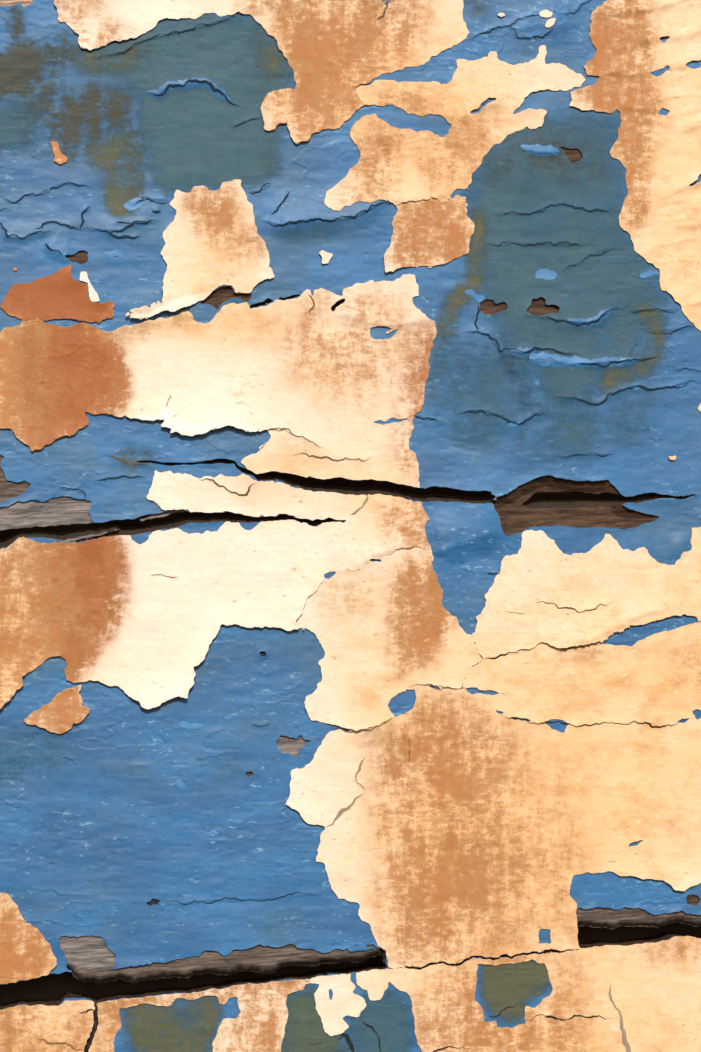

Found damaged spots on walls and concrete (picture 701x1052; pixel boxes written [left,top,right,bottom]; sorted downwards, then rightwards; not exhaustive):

peeling [611,37,701,72]
peeling [370,326,398,339]
crack [556,450,612,458]
crack [0,428,495,548]
crack [522,491,696,509]
crack [383,946,581,970]
peeling [0,998,97,1052]
crack [37,997,103,1052]
peeling [88,978,319,1052]
peeling [310,973,366,1052]
crack [310,1021,381,1052]
peeling [469,936,701,1052]